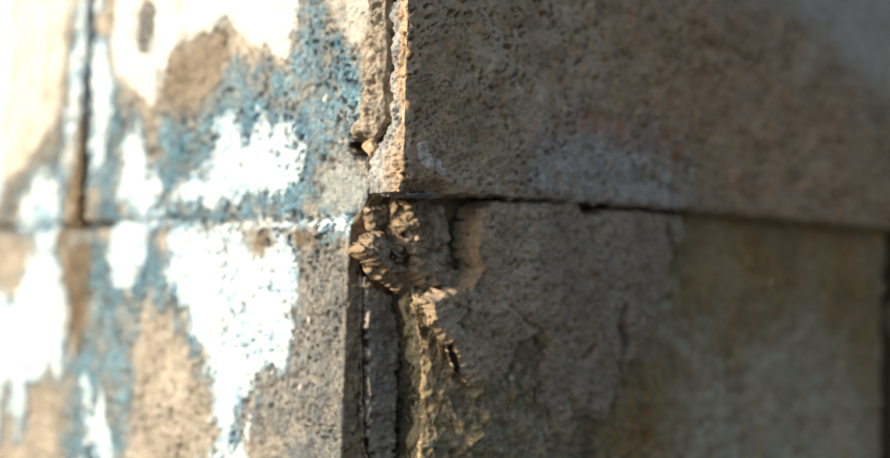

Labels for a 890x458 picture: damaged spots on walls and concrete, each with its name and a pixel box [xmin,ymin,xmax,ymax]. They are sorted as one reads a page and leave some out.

crack [348,116,392,171]
leakage [35,226,62,260]
leakage [62,0,362,458]
spalling [346,196,471,294]
leakage [0,367,28,441]
crack [358,259,375,458]